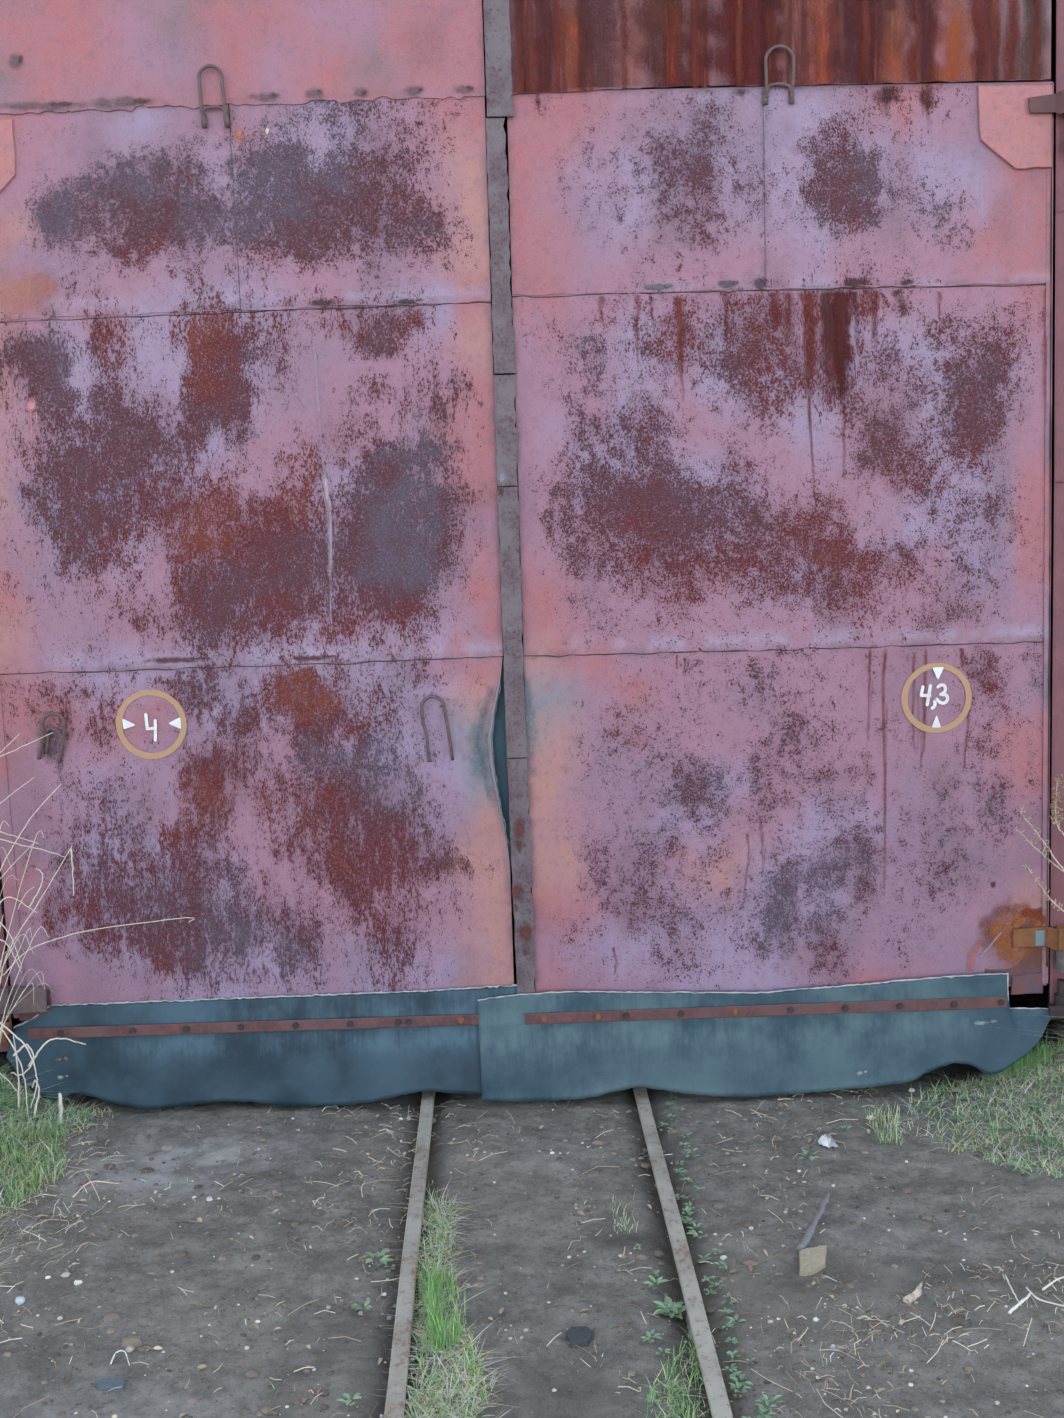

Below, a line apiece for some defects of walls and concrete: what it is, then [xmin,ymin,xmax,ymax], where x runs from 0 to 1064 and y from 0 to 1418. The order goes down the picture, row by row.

rust [0,97,505,1001]
rust [512,0,1047,992]